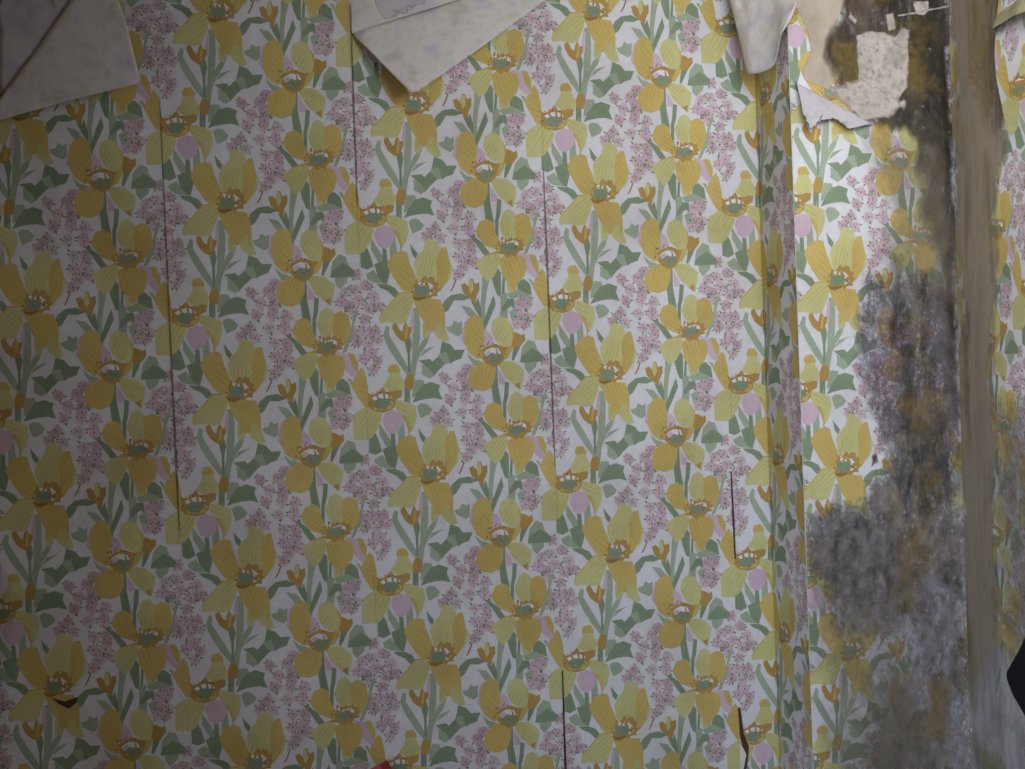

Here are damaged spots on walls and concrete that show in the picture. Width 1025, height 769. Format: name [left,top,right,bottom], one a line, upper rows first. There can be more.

flaking render [0,0,70,95]
spalling [794,0,949,120]
damp [806,0,1025,769]